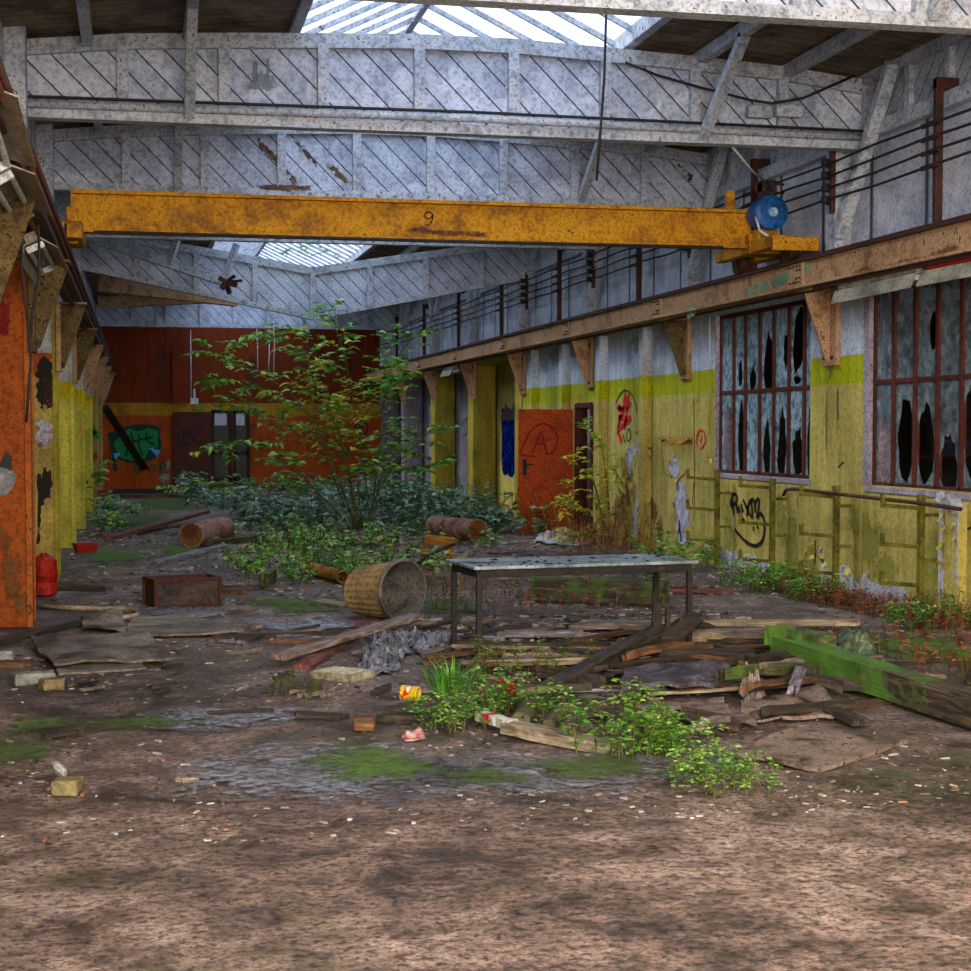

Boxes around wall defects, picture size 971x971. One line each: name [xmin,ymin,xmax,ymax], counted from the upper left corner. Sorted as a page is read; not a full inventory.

corrosion [411,226,487,237]
peeling [35,356,55,448]
corrosion [0,527,27,614]
peeling [668,453,768,575]
peeling [932,508,959,603]